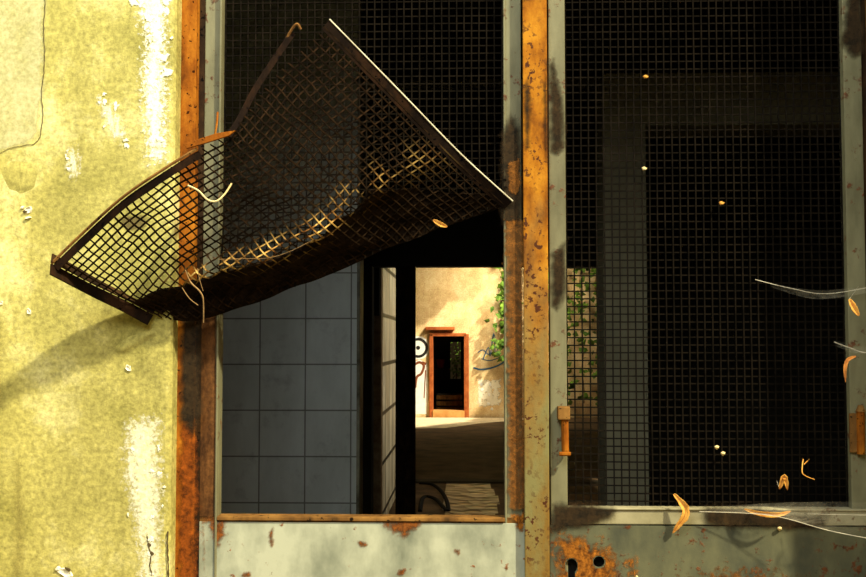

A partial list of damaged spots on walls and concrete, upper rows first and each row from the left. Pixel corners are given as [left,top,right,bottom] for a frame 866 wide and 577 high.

crack [0,0,46,154]
peeling [129,0,173,166]
peeling [121,414,168,577]
rust [179,424,199,577]